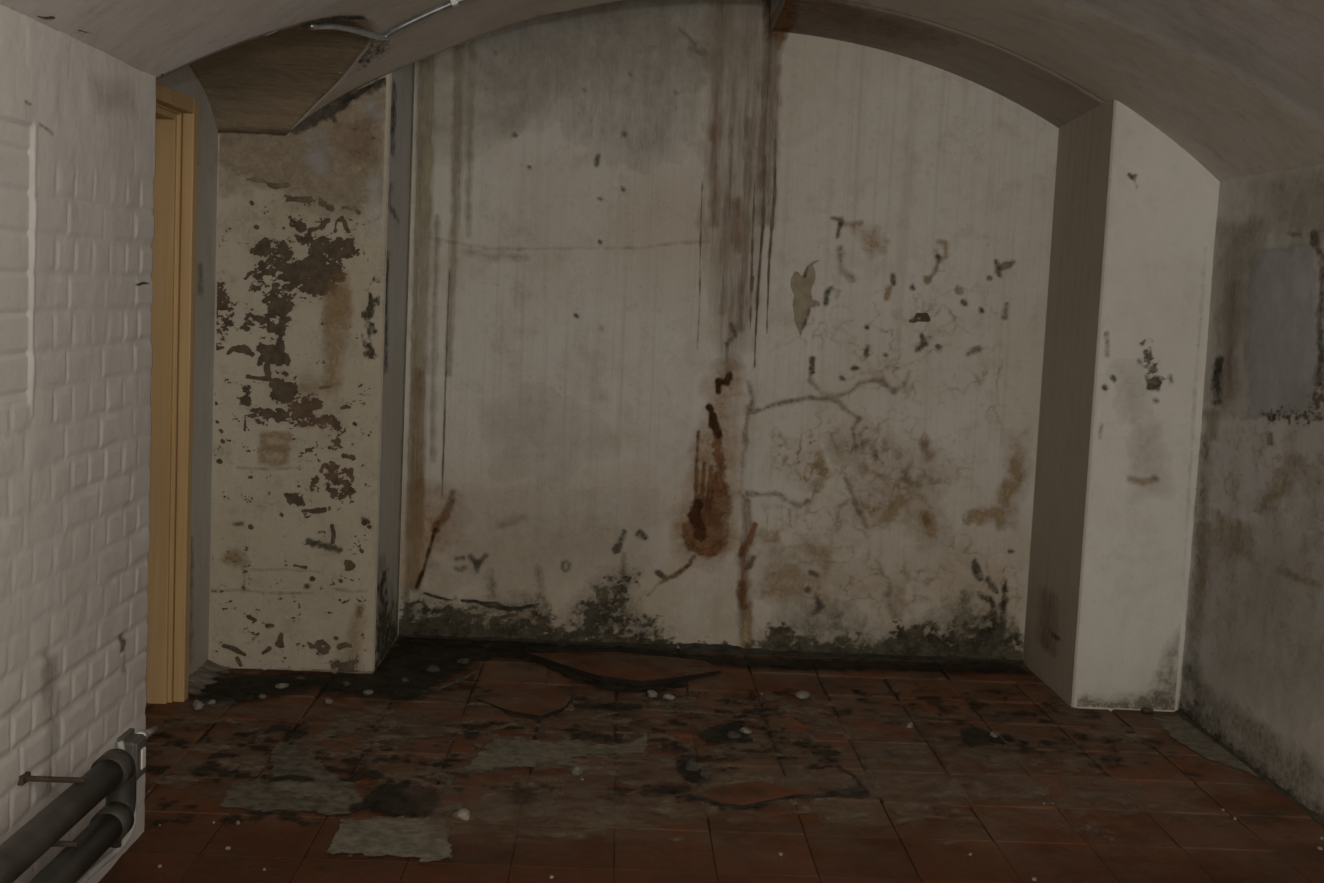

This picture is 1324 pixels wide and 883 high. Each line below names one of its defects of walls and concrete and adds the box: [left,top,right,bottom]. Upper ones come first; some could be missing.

peeling [214,177,380,622]
leakage [219,44,681,667]
spalling [790,260,832,335]
leakage [747,378,905,419]
peeling [909,312,939,351]
peeling [988,260,1015,279]
rust [676,362,736,559]
peeling [212,546,366,672]
rust [411,491,455,588]
crack [656,556,696,583]
leakage [703,512,1023,660]